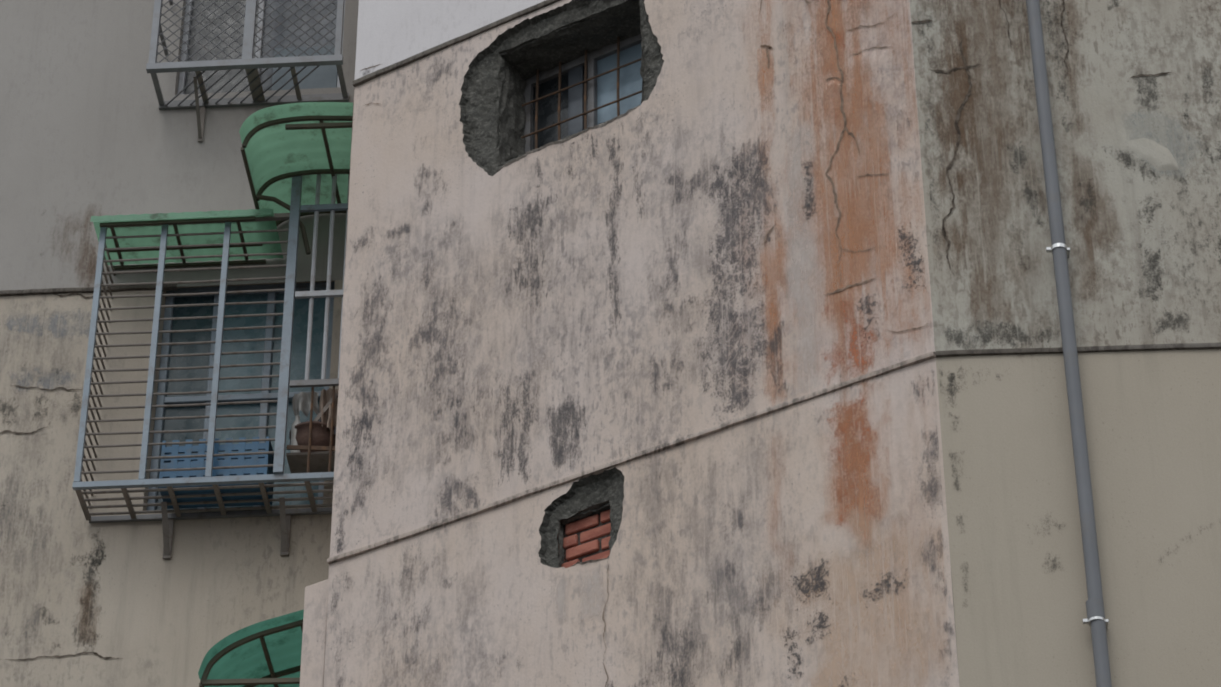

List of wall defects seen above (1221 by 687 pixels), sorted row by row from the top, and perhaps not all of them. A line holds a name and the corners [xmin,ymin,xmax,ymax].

spalling [459,0,664,176]
crack [805,0,934,295]
crack [929,35,980,274]
damp [506,197,548,300]
damp [573,138,633,318]
mould [669,147,786,412]
crack [13,384,82,392]
spalling [538,467,624,568]
rust [830,398,879,539]
crack [5,652,123,660]
damp [75,540,104,646]
mould [785,558,831,679]